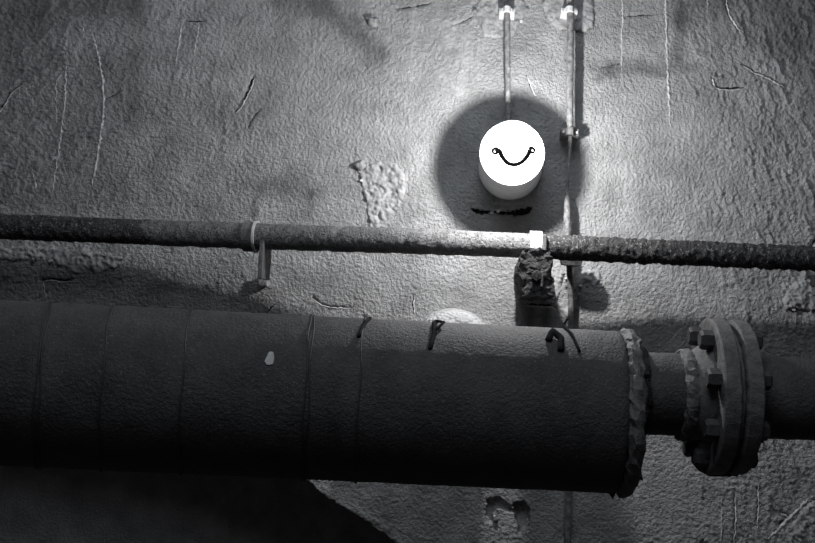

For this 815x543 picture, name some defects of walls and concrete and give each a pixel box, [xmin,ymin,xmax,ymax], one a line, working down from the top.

crack [706,0,741,34]
crack [31,27,121,196]
crack [235,78,261,128]
crack [603,0,671,135]
crack [711,66,785,91]
peeling [353,159,407,228]